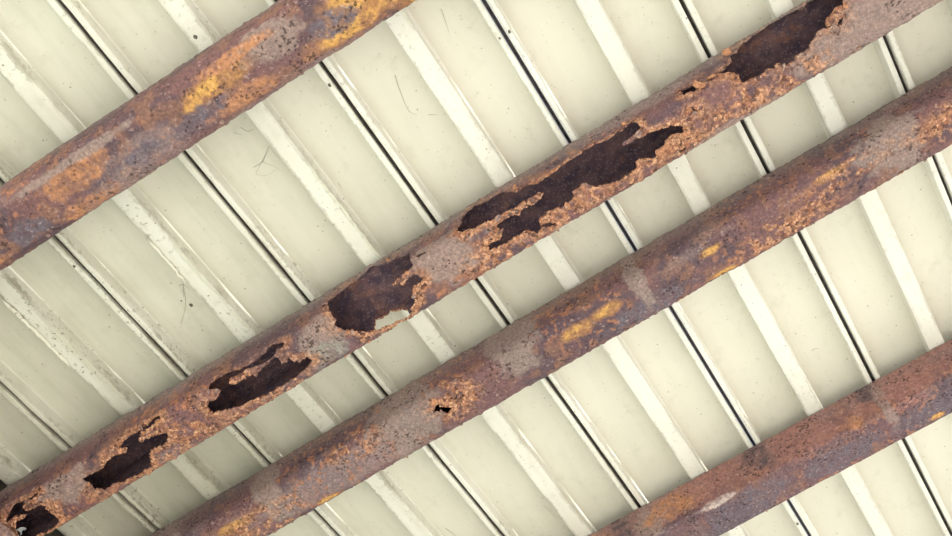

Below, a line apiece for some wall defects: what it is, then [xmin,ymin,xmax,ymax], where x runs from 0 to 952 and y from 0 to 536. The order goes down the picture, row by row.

corrosion [318,0,414,47]
corrosion [184,28,280,124]
corrosion [692,38,842,142]
corrosion [897,97,952,149]
corrosion [36,146,122,220]
corrosion [556,158,676,225]
corrosion [715,152,874,277]
corrosion [453,232,553,285]
corrosion [562,300,620,339]
corrosion [157,366,323,467]
corrosion [220,491,338,536]
corrosion [643,456,745,528]